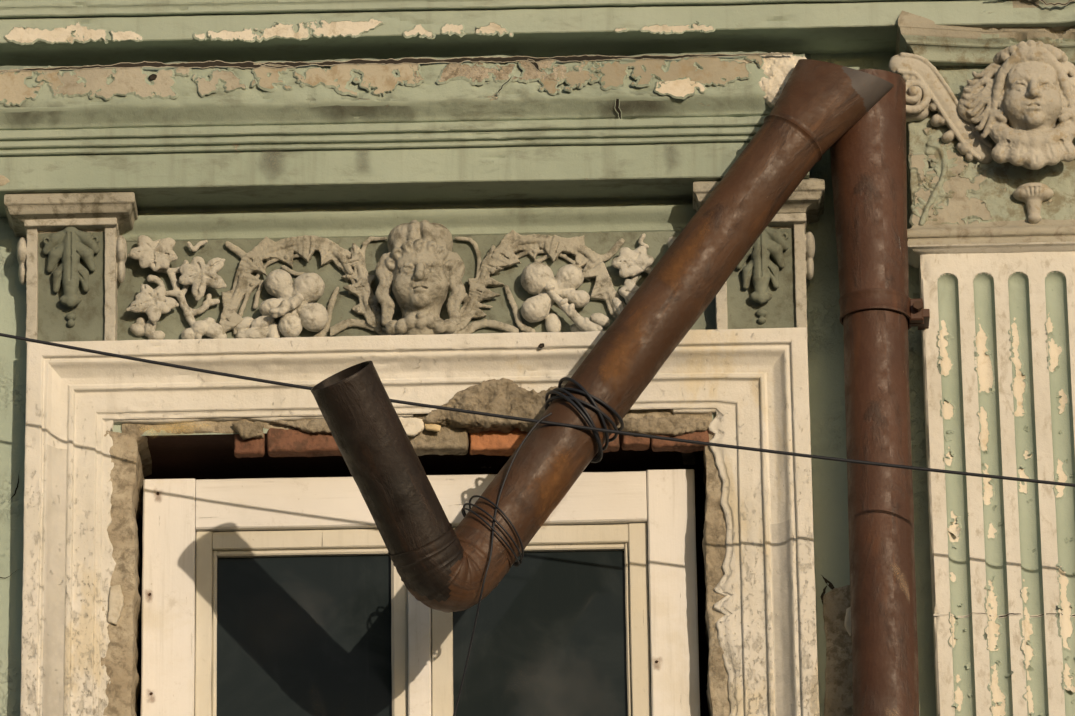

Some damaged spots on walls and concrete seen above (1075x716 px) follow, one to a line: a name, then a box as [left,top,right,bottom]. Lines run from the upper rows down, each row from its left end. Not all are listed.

peeling [4,21,144,45]
peeling [193,18,385,43]
peeling [0,52,807,109]
spalling [399,378,565,468]
peeling [936,319,954,377]
peeling [973,316,1004,541]
peeling [1008,317,1029,432]
peeling [1053,458,1073,499]
flaking render [101,418,342,716]
flaking render [602,409,730,716]
peeling [983,576,1047,716]
peeling [1055,562,1075,704]